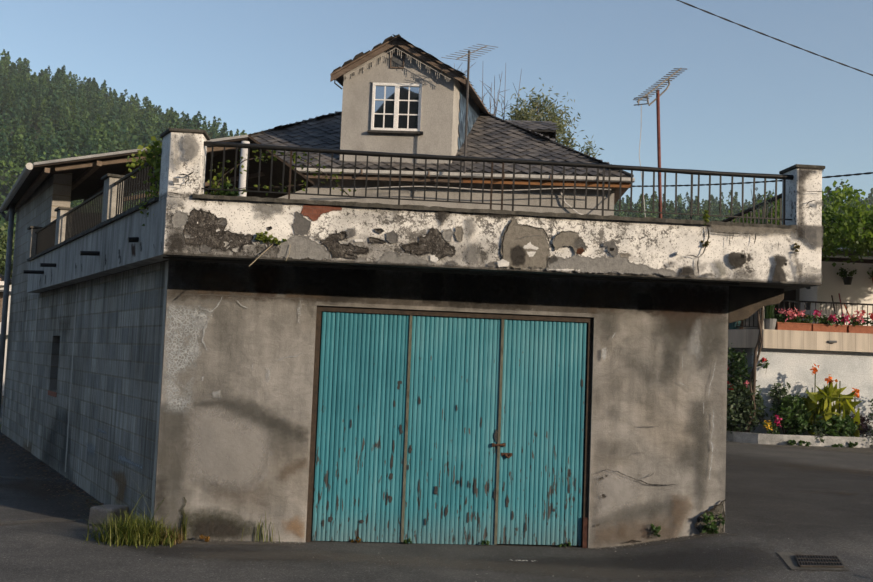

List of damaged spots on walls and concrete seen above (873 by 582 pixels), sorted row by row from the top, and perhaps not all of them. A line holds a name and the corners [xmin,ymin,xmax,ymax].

peeling [172,134,200,183]
spalling [168,198,254,253]
peeling [254,203,283,214]
spalling [292,204,475,263]
spalling [497,218,677,276]
water stain [273,244,727,313]
crack [596,469,675,486]
water stain [179,497,294,544]
spalling [695,499,726,535]